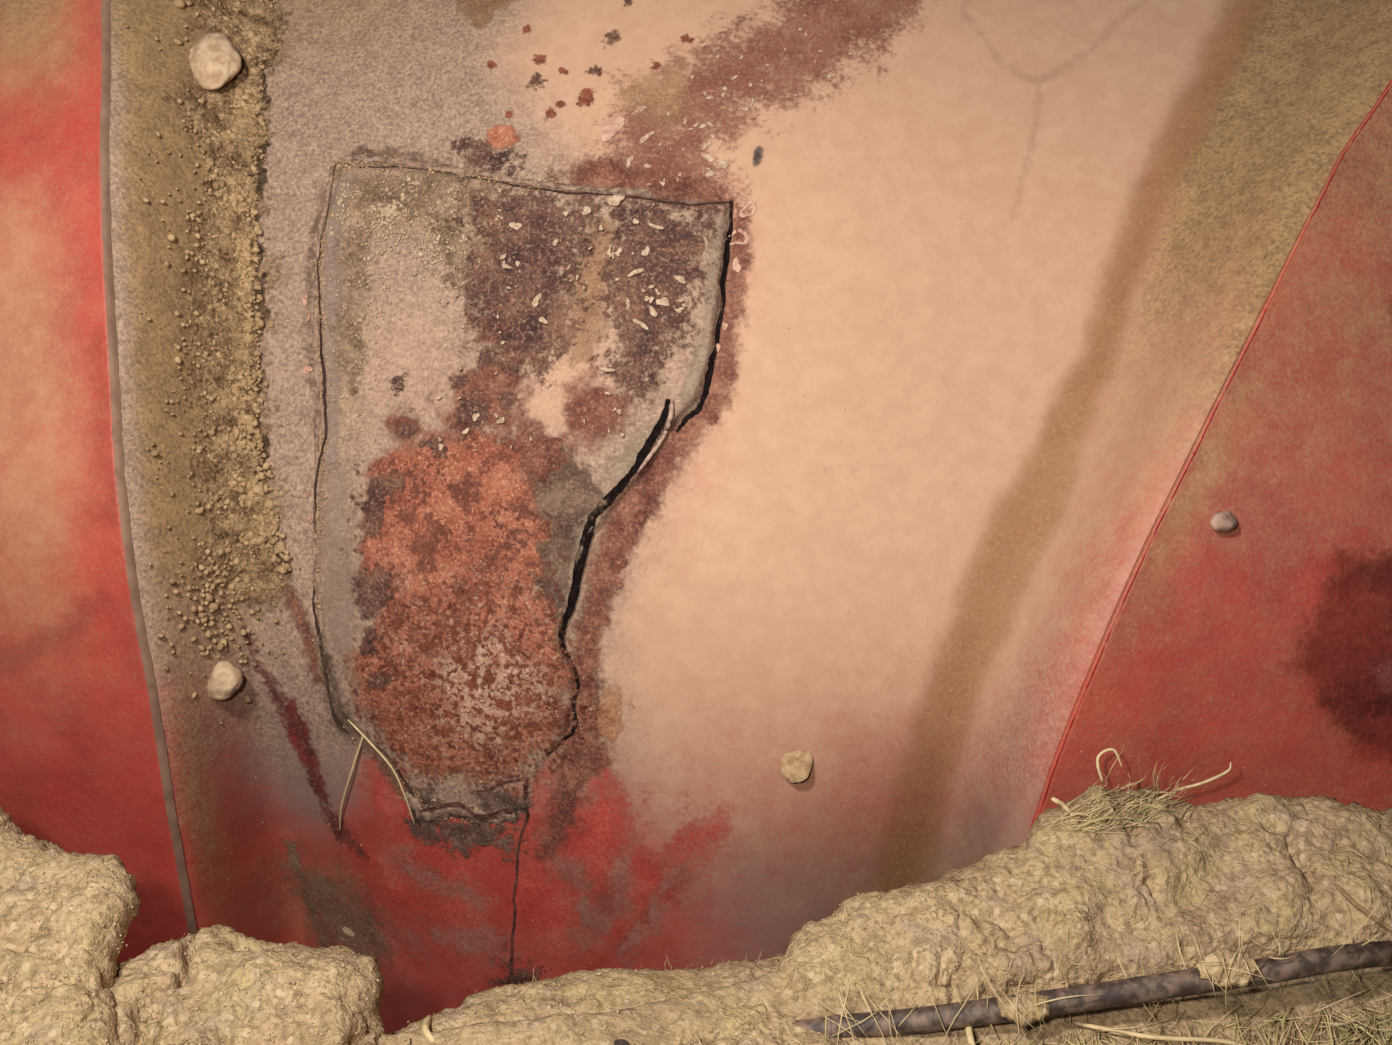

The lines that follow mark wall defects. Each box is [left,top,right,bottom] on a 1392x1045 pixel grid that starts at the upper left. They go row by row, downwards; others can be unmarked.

peeling [691,55,769,111]
peeling [626,112,729,186]
peeling [607,194,625,206]
peeling [563,206,686,330]
peeling [724,200,757,273]
peeling [532,293,547,324]
peeling [462,413,505,434]
corrosion [322,0,919,861]
crack [307,146,733,984]
corrosion [276,573,334,694]
corrosion [241,625,369,858]
corrosion [486,942,546,988]